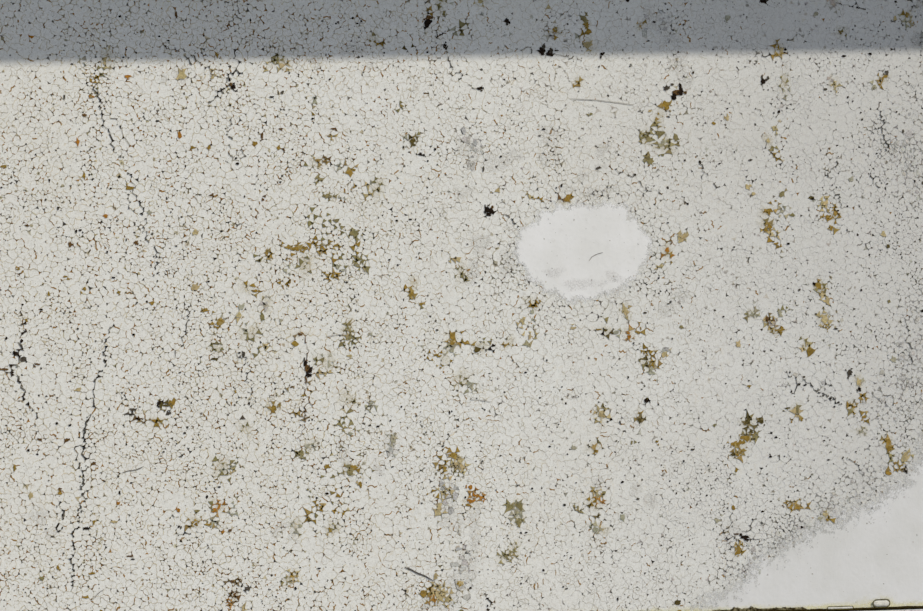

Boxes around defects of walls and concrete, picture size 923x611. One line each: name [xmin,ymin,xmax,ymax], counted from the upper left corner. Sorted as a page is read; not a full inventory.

crack [163,44,243,103]
crack [425,1,482,89]
peeling [639,83,687,164]
crack [92,84,162,282]
peeling [253,154,384,287]
peeling [760,189,795,249]
crack [6,321,38,426]
crack [786,371,842,405]
crack [56,324,115,591]
peeling [726,409,766,472]
peeling [421,445,528,564]
peeling [419,573,472,611]